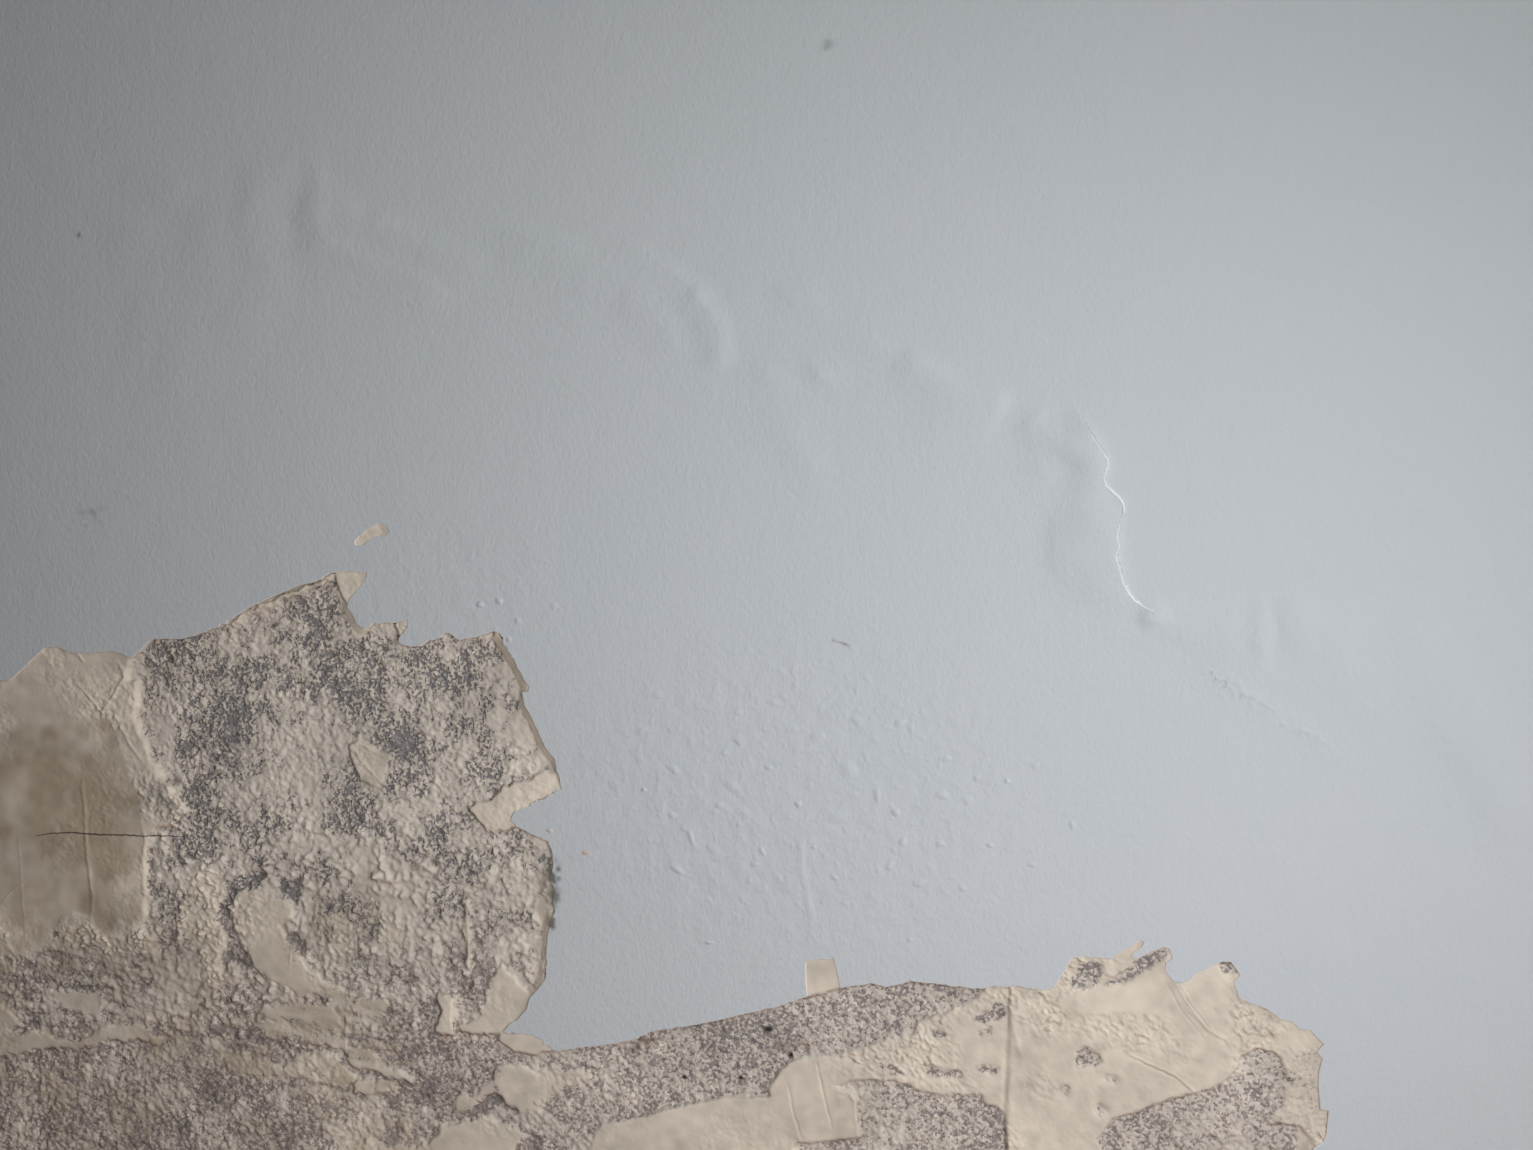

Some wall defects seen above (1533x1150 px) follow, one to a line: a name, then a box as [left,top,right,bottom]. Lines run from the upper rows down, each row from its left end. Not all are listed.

peeling [0,571,1329,1150]